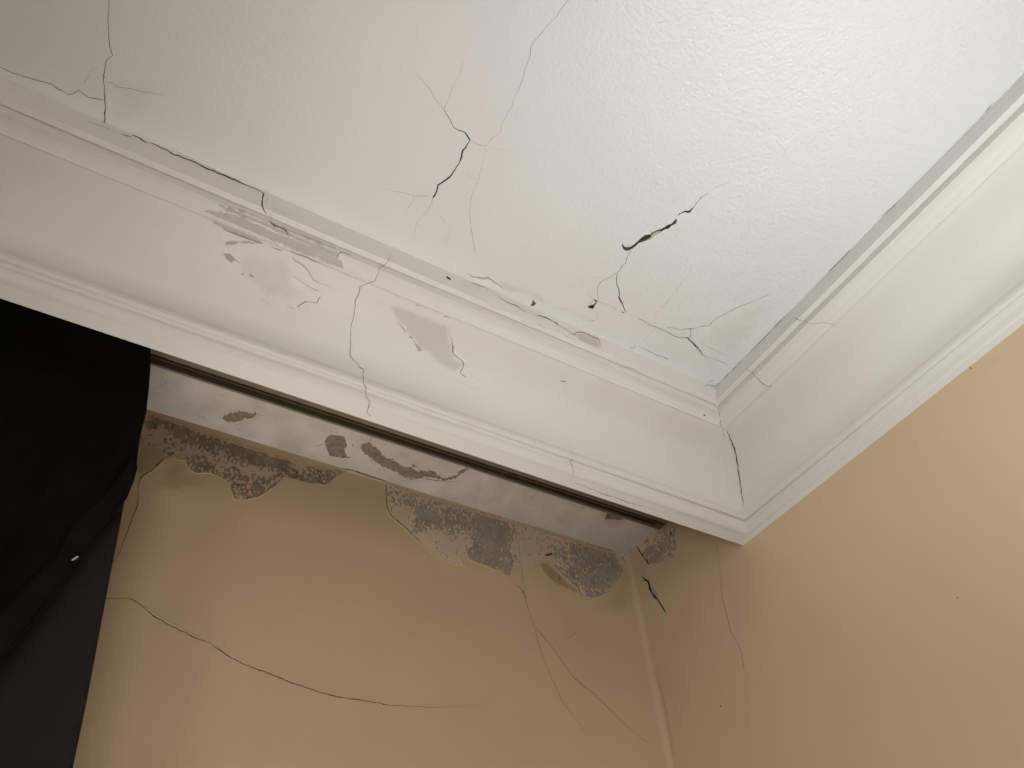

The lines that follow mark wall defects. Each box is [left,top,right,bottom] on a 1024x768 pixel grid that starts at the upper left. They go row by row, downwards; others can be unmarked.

crack [1,13,325,285]
peeling [205,199,349,268]
crack [395,0,834,387]
crack [350,257,390,413]
peeling [114,411,679,600]
crack [719,412,743,498]
crack [106,596,435,708]
peeling [641,576,667,614]